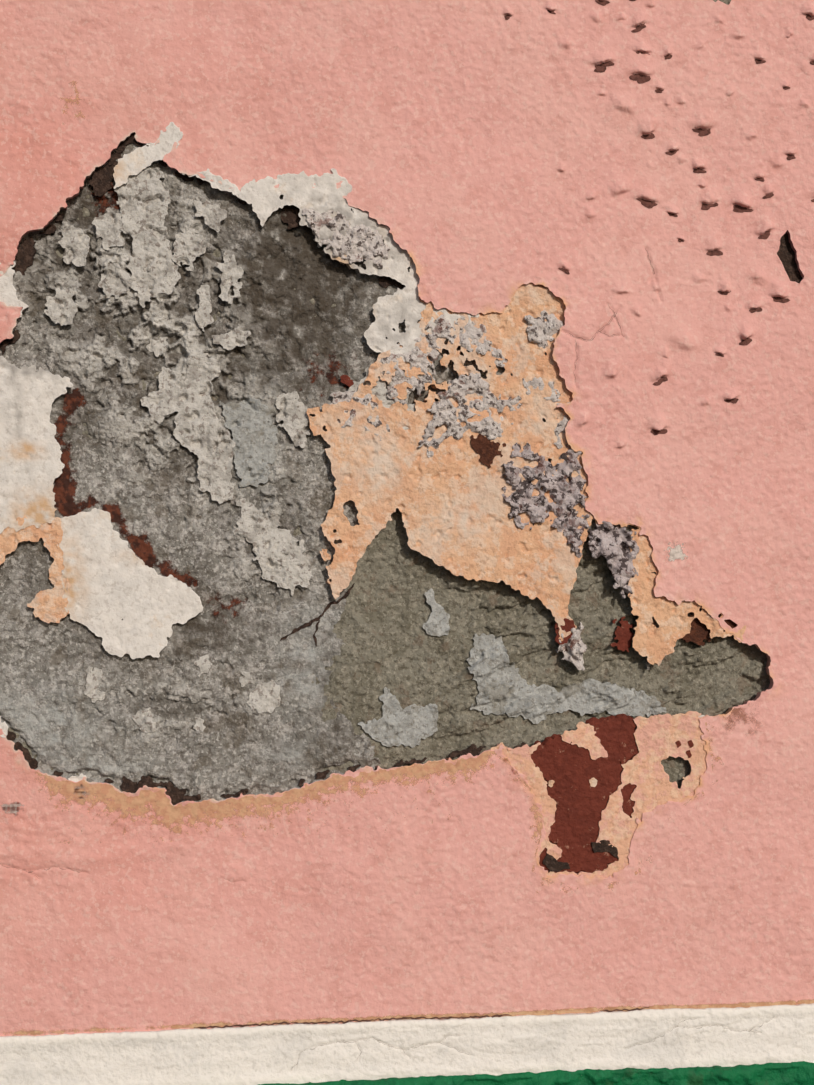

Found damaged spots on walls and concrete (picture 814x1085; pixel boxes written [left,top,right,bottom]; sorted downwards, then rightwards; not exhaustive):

peeling [777,233,802,283]
flaking render [0,122,770,878]
crack [603,1005,649,1013]
crack [194,1014,512,1065]